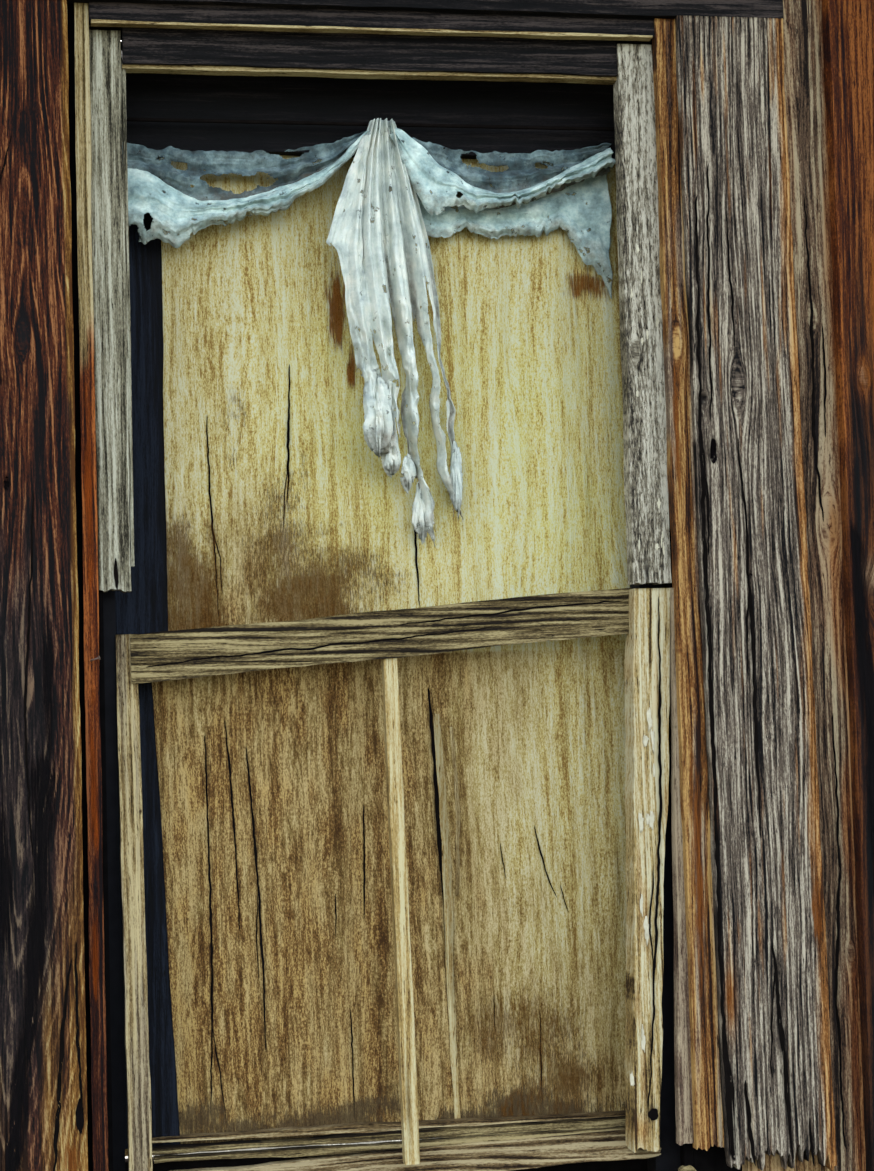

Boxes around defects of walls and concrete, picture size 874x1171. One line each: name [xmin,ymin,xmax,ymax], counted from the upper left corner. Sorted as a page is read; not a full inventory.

crack [206,420,223,616]
crack [282,364,290,527]
water stain [239,474,389,622]
crack [204,722,266,1118]
crack [534,825,568,911]